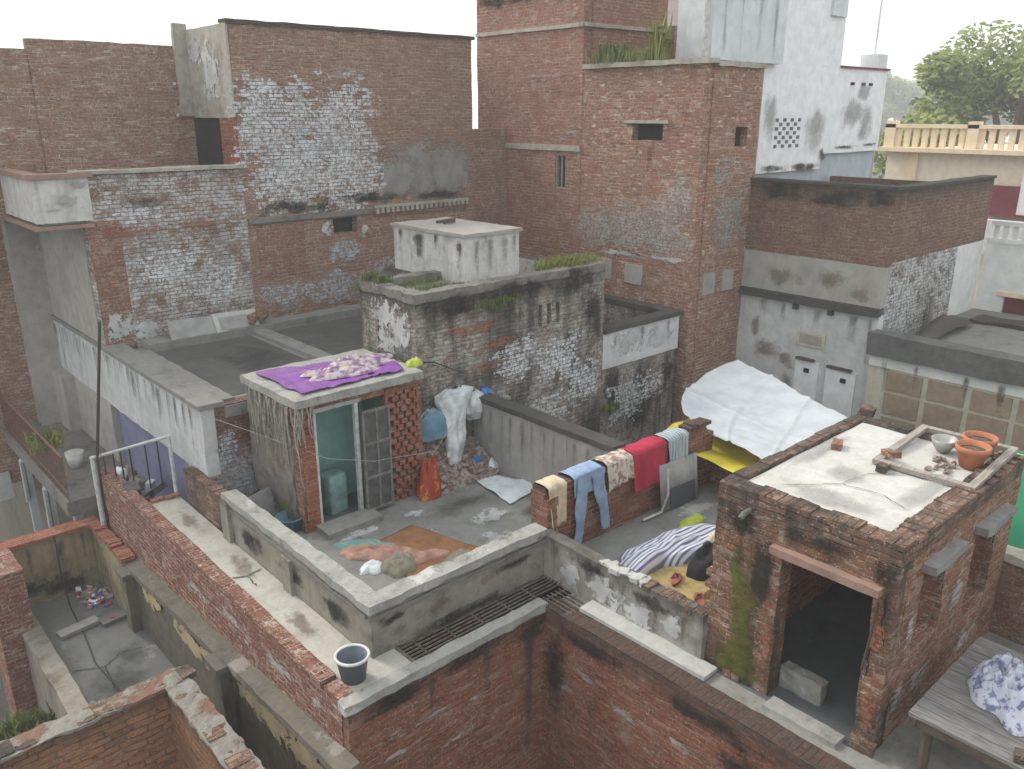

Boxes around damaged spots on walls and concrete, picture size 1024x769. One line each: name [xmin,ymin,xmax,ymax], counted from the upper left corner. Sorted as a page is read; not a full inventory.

peeling [131,37,387,310]
water stain [763,112,893,208]
water stain [264,201,329,213]
flaking render [370,298,411,358]
peeling [448,319,663,427]
crack [786,473,908,508]
spalling [599,559,652,588]
water stain [751,543,772,603]
water stain [323,598,346,622]
crack [72,647,142,692]
flaking render [233,679,324,769]
water stain [365,682,434,722]